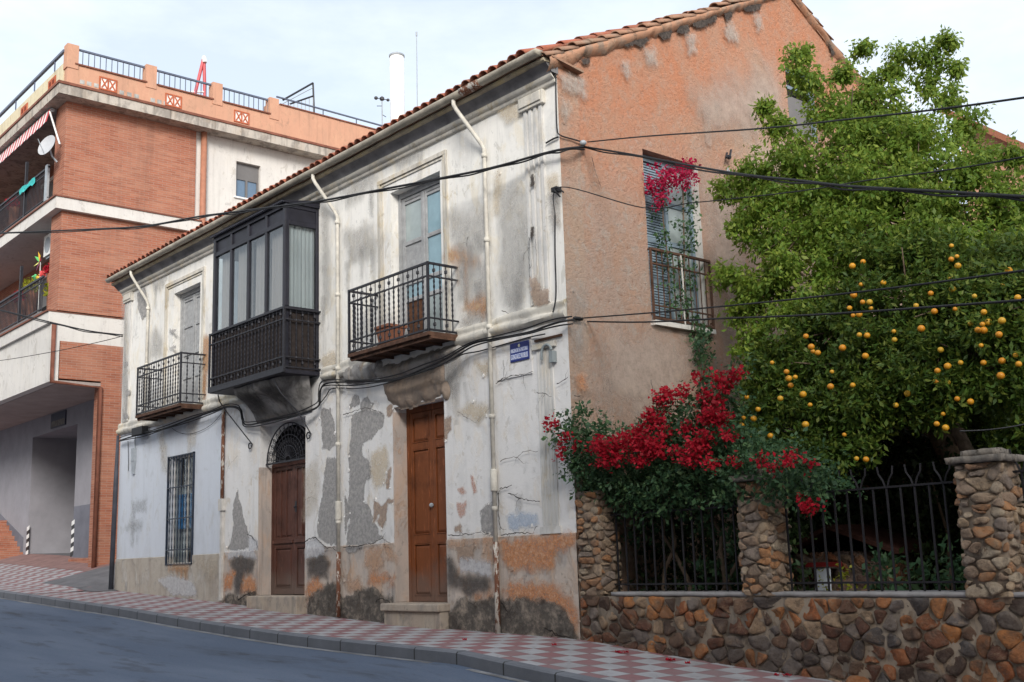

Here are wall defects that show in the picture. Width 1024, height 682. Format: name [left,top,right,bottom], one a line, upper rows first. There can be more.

spalling [223,489,256,606]
leakage [231,554,254,594]
spalling [305,394,394,558]
crack [448,450,540,542]
spalling [448,502,580,640]